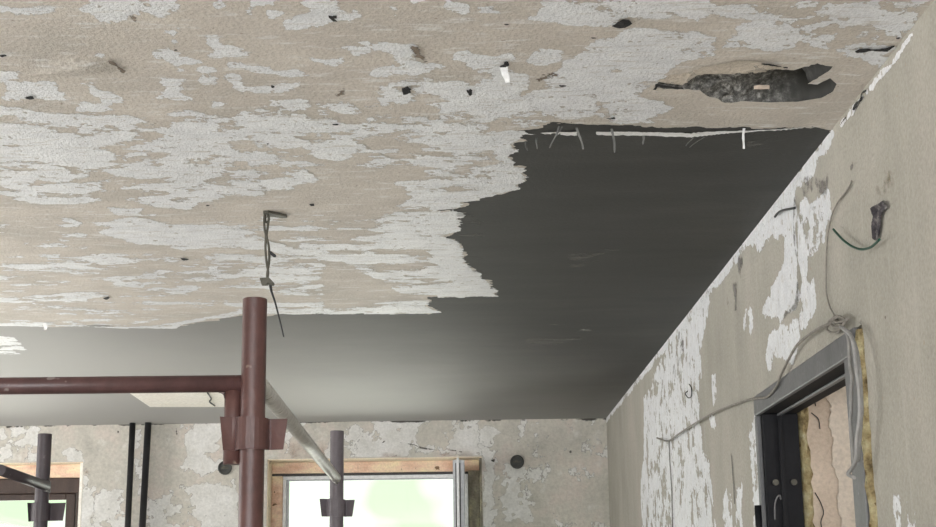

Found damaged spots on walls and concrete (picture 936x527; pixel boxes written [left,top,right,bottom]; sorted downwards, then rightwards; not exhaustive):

peeling [0,0,930,355]
peeling [590,130,834,527]
peeling [0,426,41,462]
peeling [62,447,125,527]
peeling [134,423,239,527]
peeling [344,419,551,527]